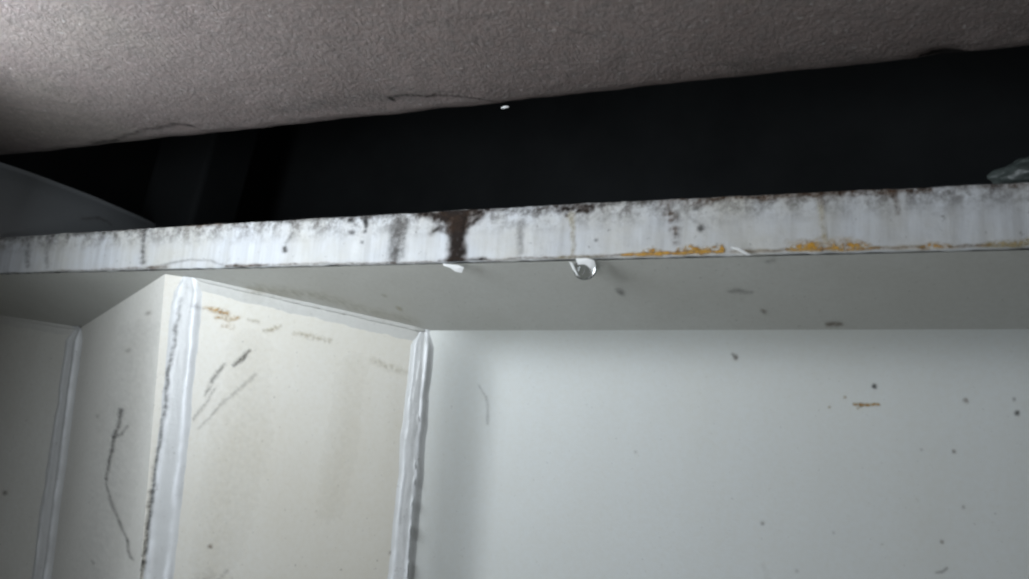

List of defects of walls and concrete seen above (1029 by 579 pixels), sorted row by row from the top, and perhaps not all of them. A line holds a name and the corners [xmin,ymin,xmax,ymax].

corrosion [621,245,724,256]
corrosion [767,242,881,251]